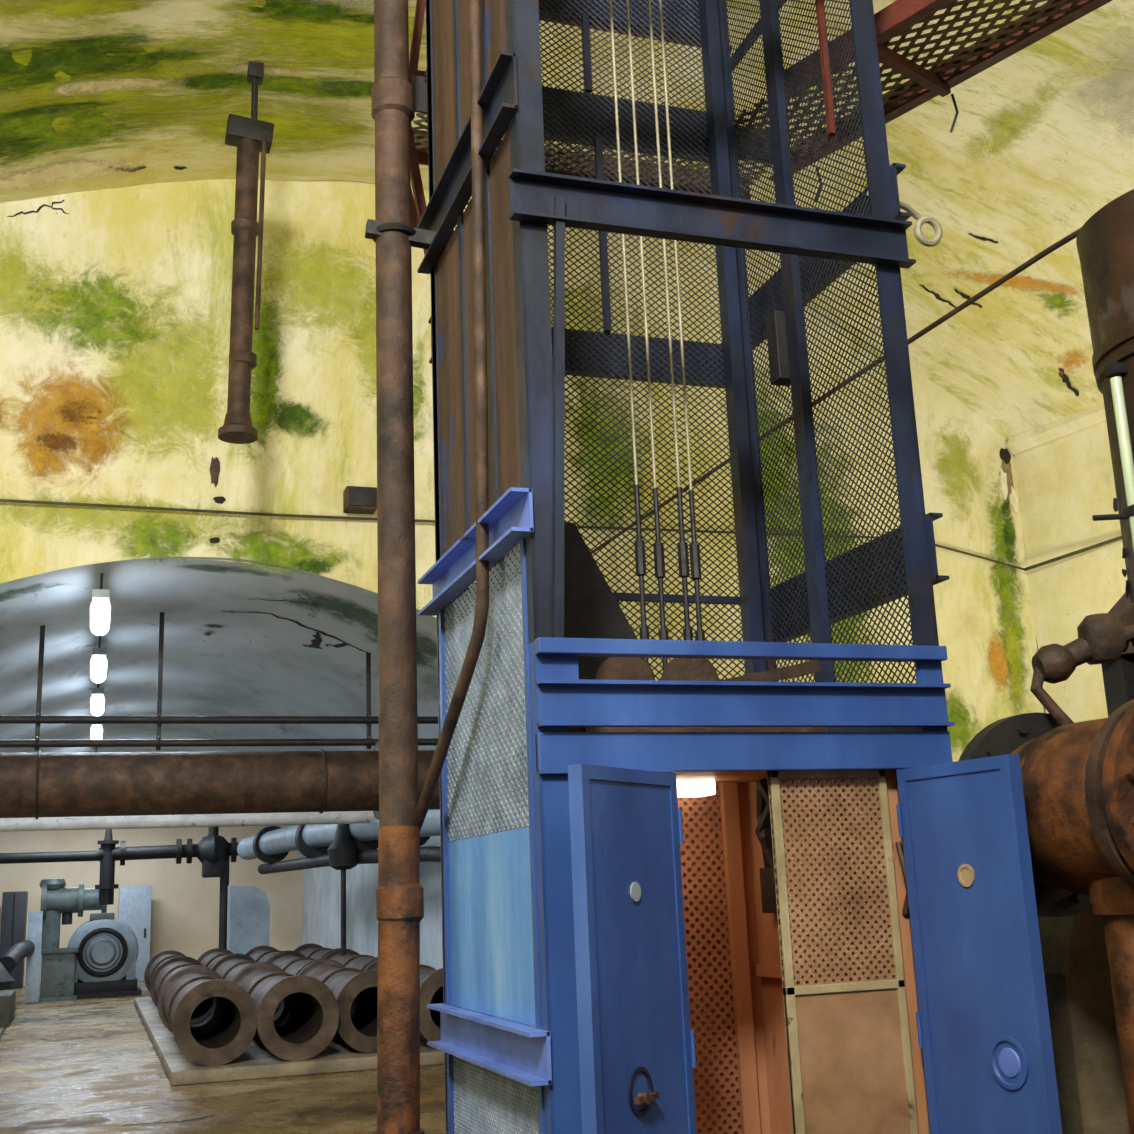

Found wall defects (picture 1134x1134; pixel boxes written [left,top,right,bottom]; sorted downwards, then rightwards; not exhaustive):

damp [45,36,146,50]
damp [129,51,203,62]
damp [177,73,246,89]
damp [319,79,374,96]
damp [1,102,109,118]
rust [0,375,127,475]
damp [1002,500,1016,561]
damp [1006,621,1022,697]